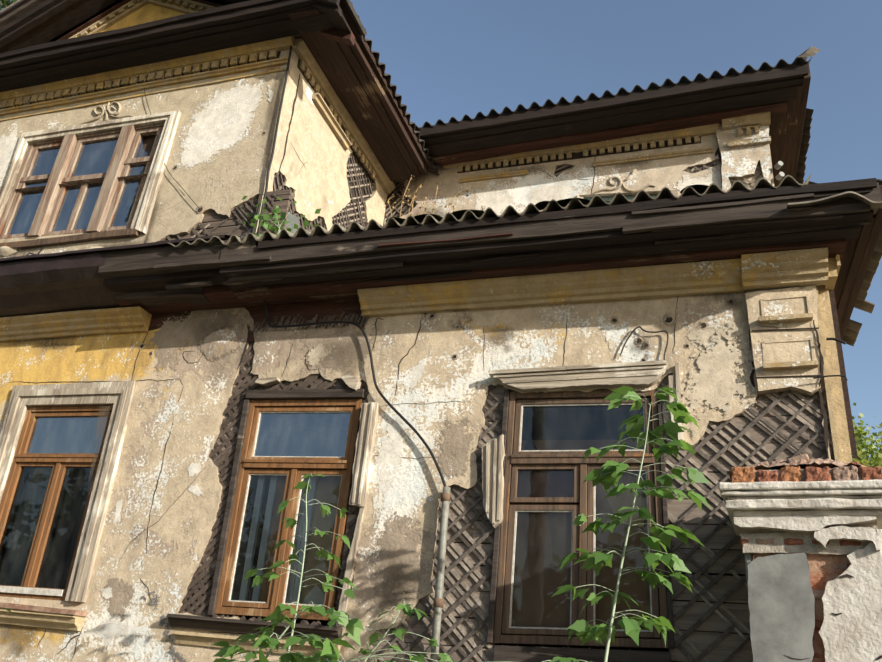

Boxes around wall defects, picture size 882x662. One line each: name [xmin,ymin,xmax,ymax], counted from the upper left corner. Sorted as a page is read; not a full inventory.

crack [279,74,307,175]
flaking render [163,153,374,241]
flaking render [383,181,448,225]
peeling [672,159,762,193]
crack [8,330,204,402]
peeling [606,316,620,351]
spalling [634,336,650,361]
crack [119,424,206,561]
flaking render [139,309,376,621]
flaking render [368,385,518,662]
flaking render [663,321,880,662]